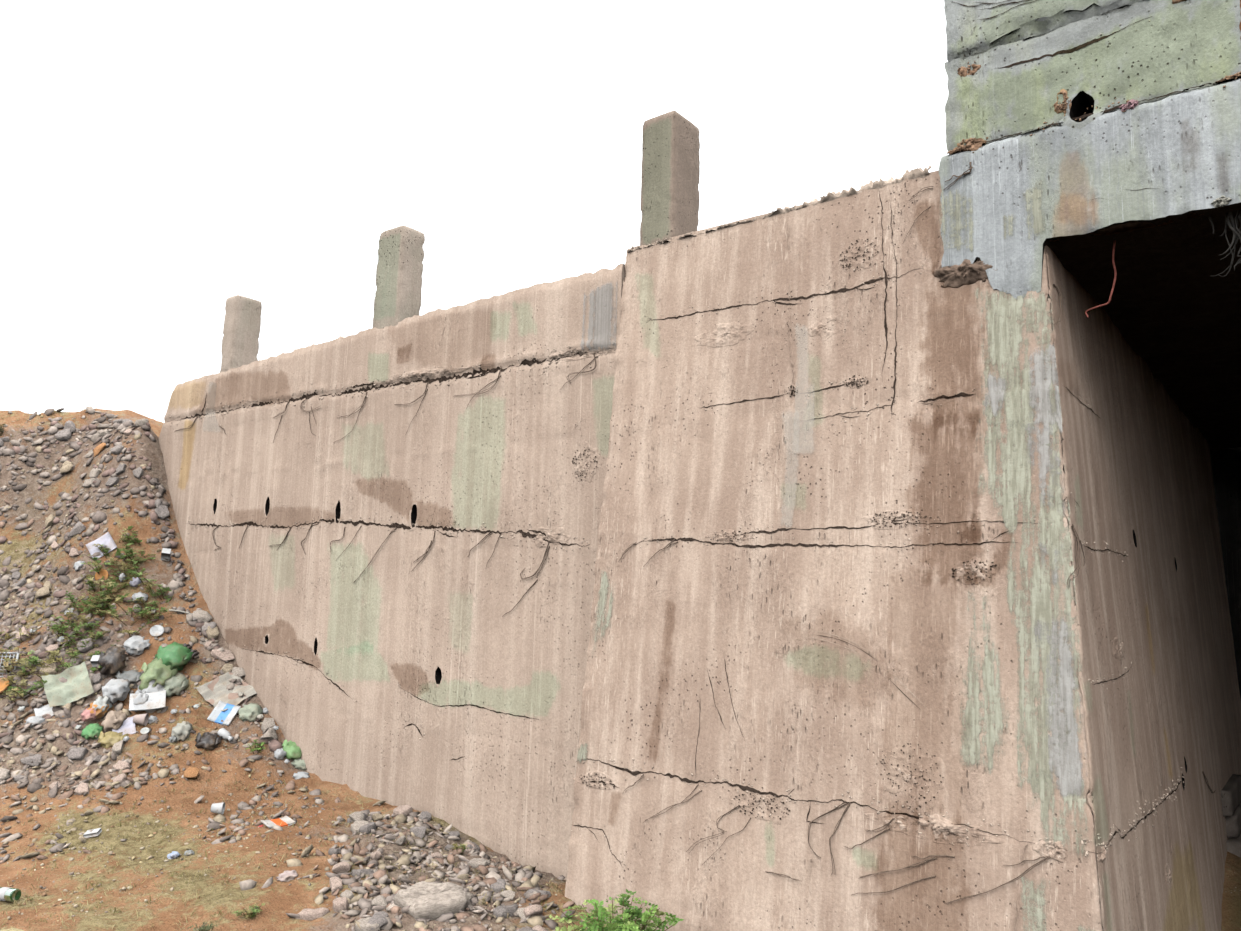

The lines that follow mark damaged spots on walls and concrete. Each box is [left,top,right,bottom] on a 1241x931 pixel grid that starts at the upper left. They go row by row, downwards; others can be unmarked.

crack [645,193,976,425]
crack [165,341,616,428]
crack [186,512,590,555]
crack [617,492,1078,559]
crack [1082,540,1129,557]
damp [979,345,1087,854]
crack [398,684,544,739]
crack [573,659,1035,846]
crack [571,822,626,866]
crack [1081,767,1187,867]